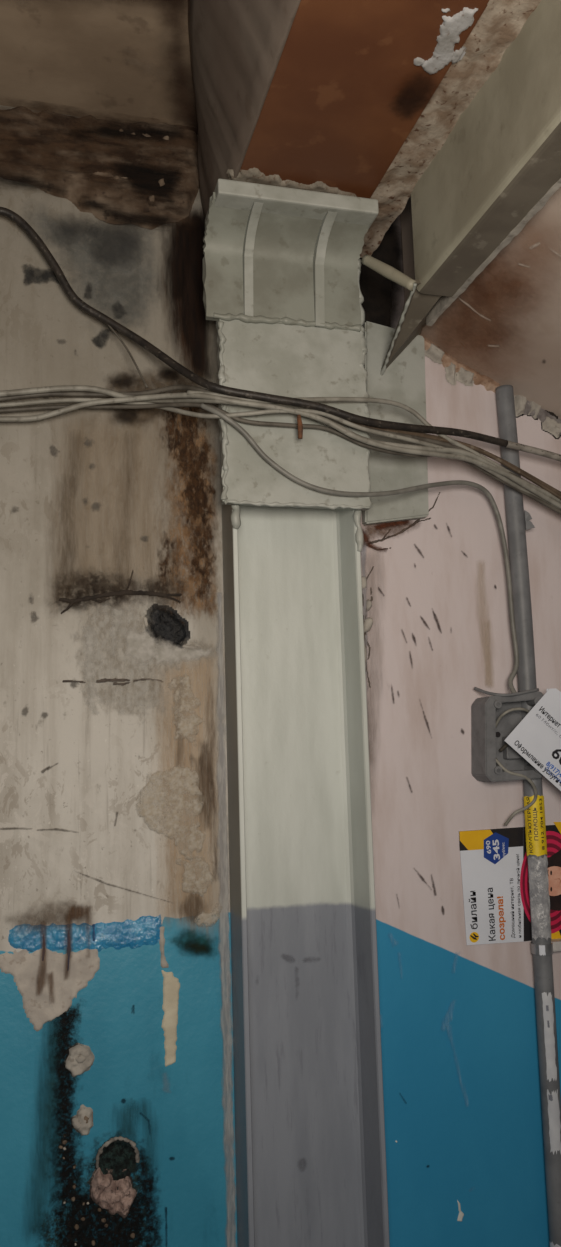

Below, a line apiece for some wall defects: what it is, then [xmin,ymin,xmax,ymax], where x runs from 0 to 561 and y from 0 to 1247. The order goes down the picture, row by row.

peeling [414,7,478,74]
leakage [0,176,52,188]
flaking render [421,335,500,394]
flaking render [514,395,561,438]
corrosion [112,370,216,614]
peeling [137,767,213,897]
peeling [0,948,100,1031]
peeling [159,926,180,1067]
peeling [64,1043,95,1078]
flaking render [58,1104,137,1246]